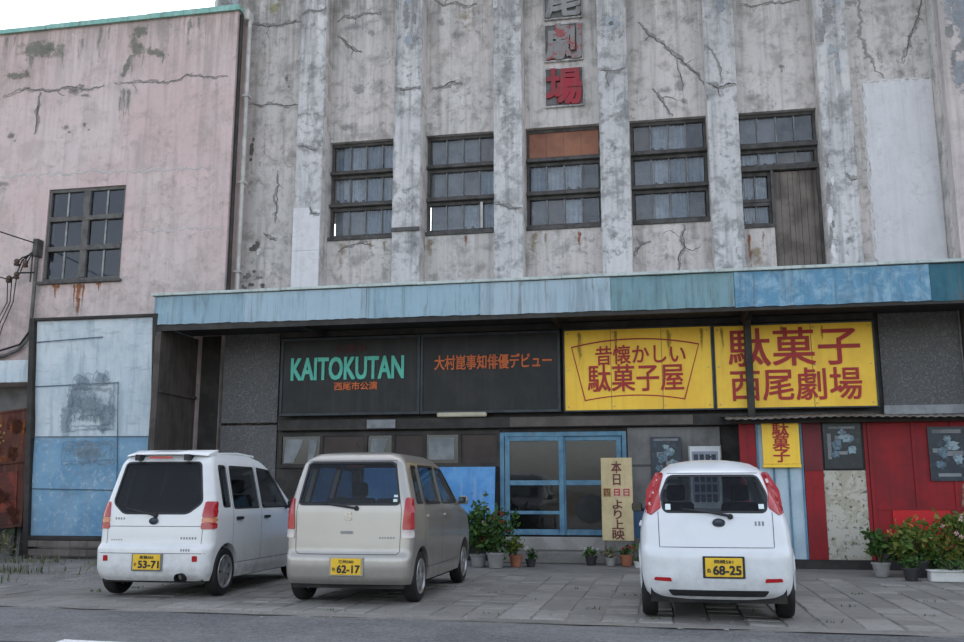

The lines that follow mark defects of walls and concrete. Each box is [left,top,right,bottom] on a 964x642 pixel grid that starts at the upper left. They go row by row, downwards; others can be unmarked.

crack [252,7,381,53]
crack [903,0,924,64]
peeling [944,0,964,66]
crack [638,22,736,116]
crack [3,73,225,131]
corrosion [73,282,101,311]